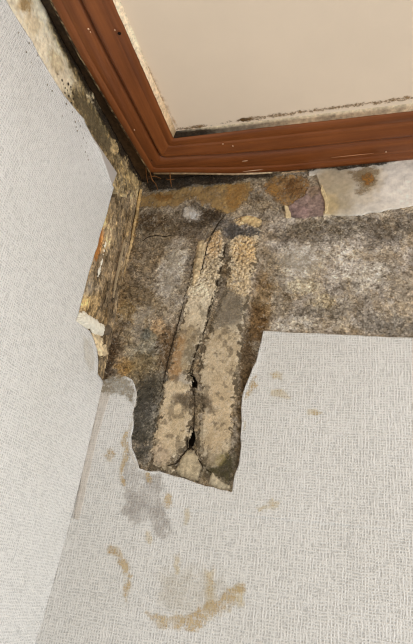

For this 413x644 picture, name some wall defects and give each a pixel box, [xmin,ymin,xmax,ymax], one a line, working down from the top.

water stain [44,5,413,191]
crack [154,214,227,478]
peeling [7,0,413,492]
water stain [209,449,236,485]